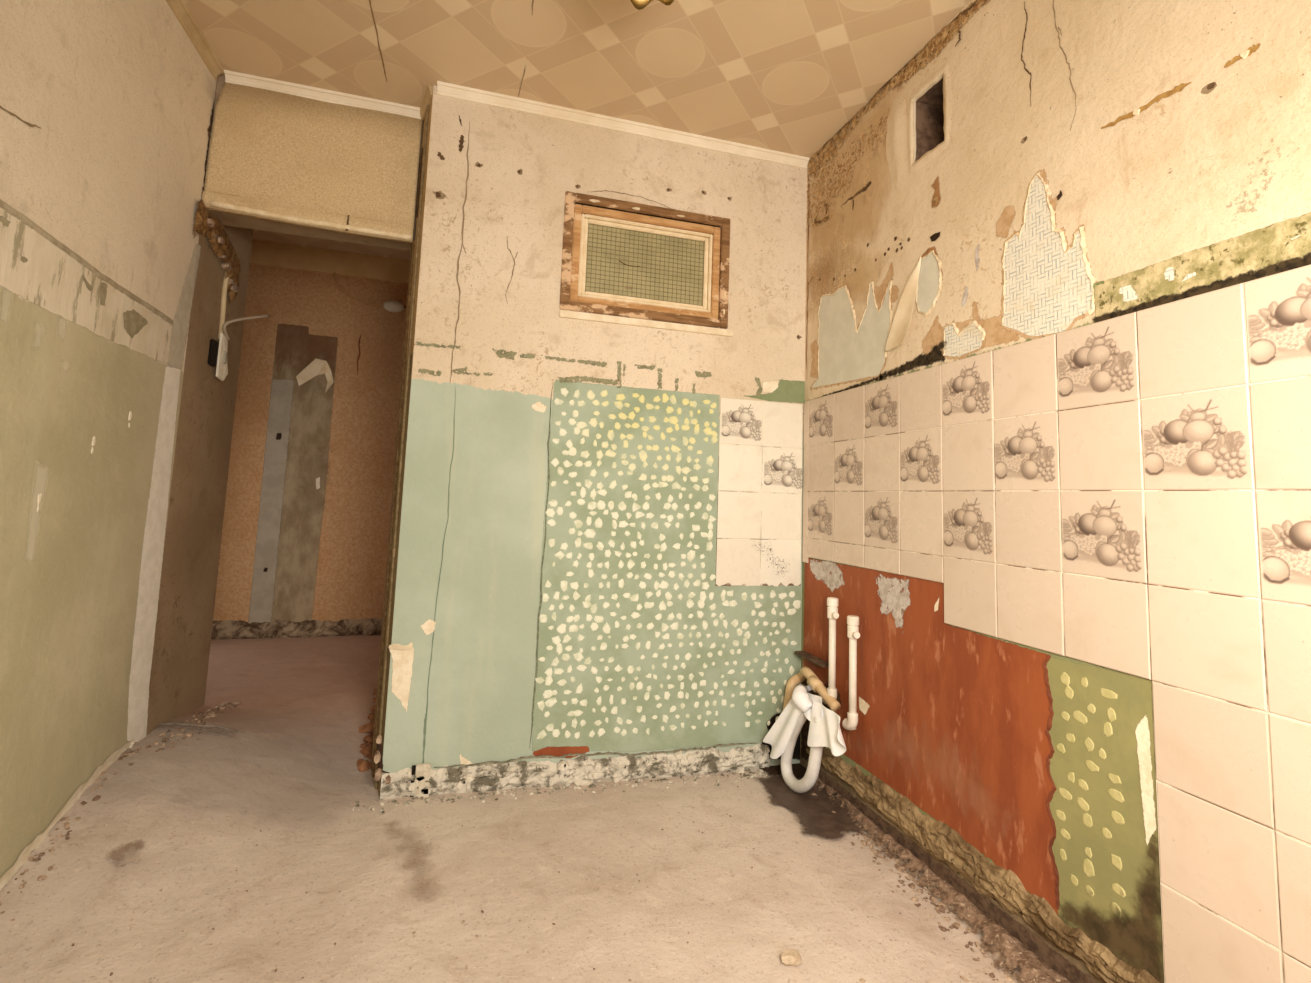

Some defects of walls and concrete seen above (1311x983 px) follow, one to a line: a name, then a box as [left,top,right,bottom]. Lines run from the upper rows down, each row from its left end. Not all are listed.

flaking render [806,0,989,231]
crack [1021,0,1076,130]
peeling [797,237,910,391]
peeling [915,169,1098,359]
peeling [0,199,240,891]
flaking render [248,324,338,624]
peeling [388,619,436,712]
crack [416,116,470,763]
flaking render [810,559,845,592]
flaking render [875,574,911,629]
flaking render [374,654,1160,983]
leakage [759,763,860,839]